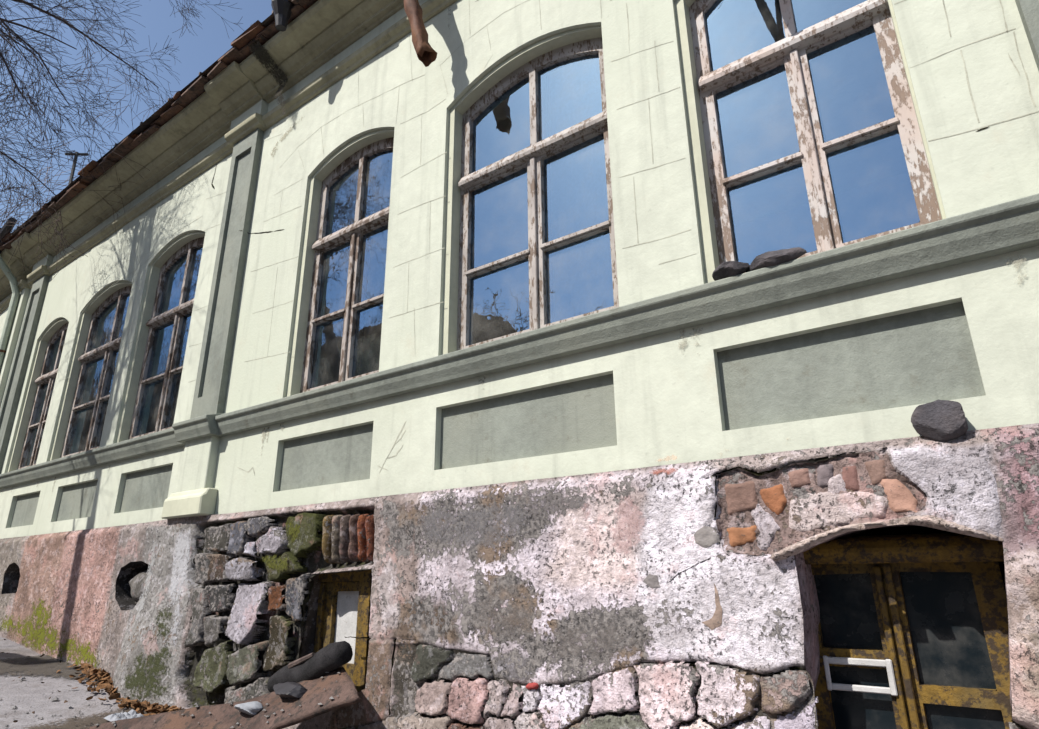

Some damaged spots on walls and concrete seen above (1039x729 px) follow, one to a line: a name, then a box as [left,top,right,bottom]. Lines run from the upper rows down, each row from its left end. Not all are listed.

flaking render [694,451,927,556]
flaking render [183,509,375,706]
flaking render [346,644,819,729]